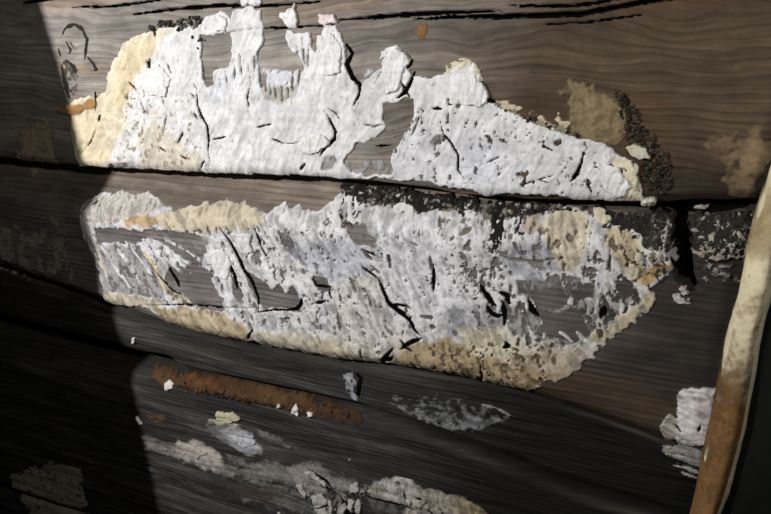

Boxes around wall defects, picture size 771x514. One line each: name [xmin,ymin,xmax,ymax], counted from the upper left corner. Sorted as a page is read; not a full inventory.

crack [22,0,52,8]
crack [72,0,673,30]
water stain [57,0,771,391]
spalling [715,166,771,514]
rust [151,362,363,426]
water stain [343,372,363,401]
spalling [296,465,366,514]